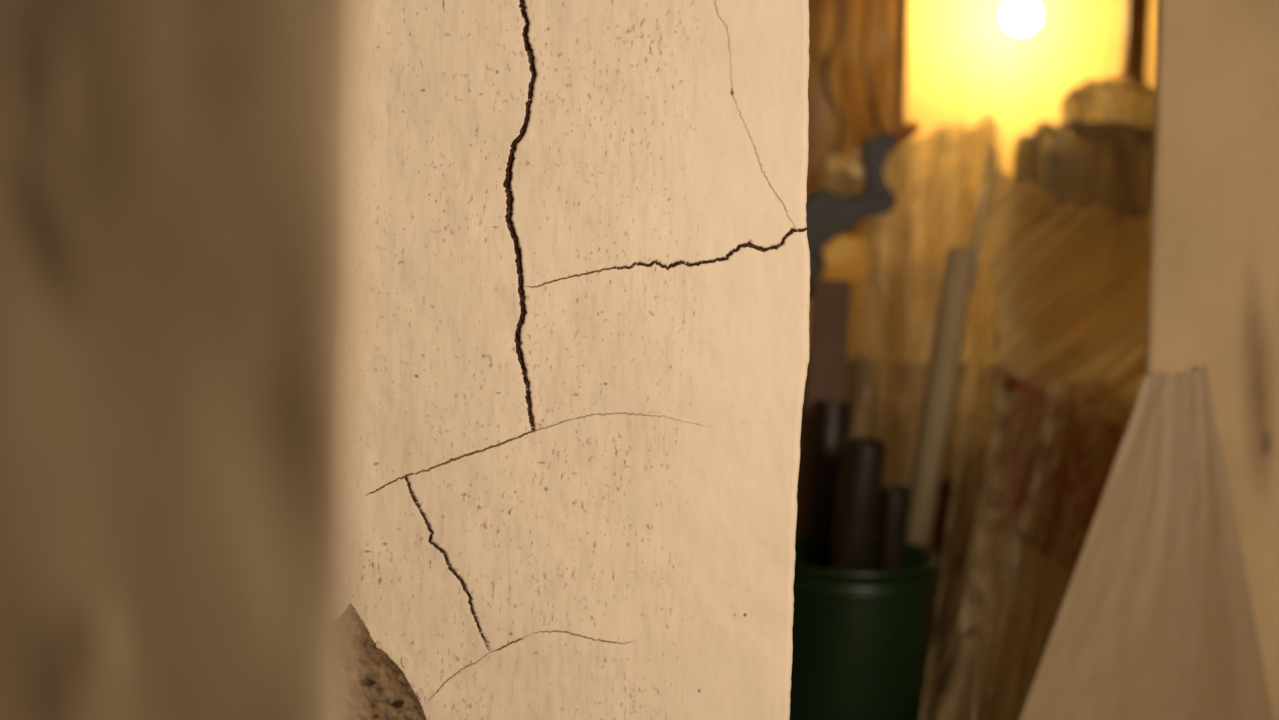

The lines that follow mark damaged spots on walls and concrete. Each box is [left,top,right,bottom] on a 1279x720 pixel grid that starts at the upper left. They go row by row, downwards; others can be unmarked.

spalling [349,604,425,720]
crack [366,0,809,693]